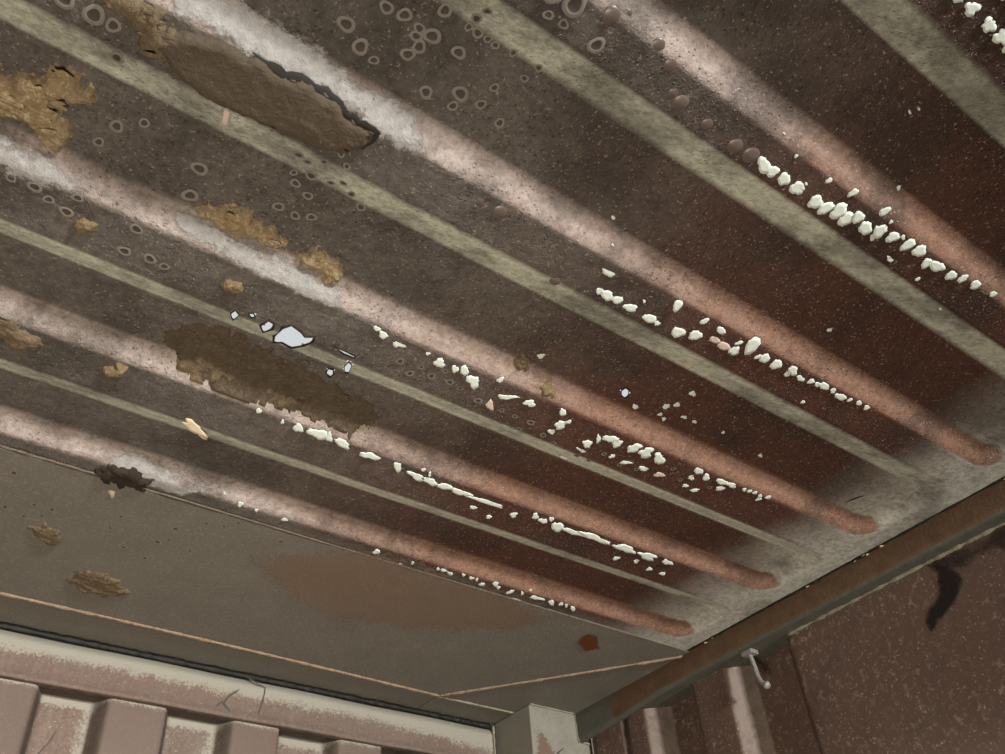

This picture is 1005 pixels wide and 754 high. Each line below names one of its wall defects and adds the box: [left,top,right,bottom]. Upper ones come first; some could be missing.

peeling [172,0,421,155]
peeling [0,136,83,191]
peeling [171,353,234,385]
peeling [256,388,381,461]
peeling [394,462,518,519]
peeling [532,513,673,576]